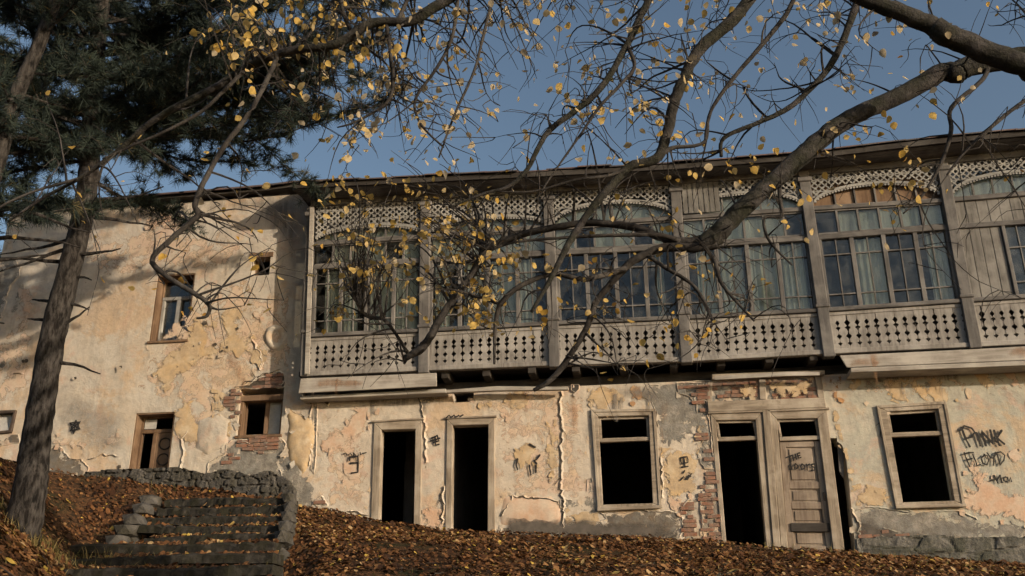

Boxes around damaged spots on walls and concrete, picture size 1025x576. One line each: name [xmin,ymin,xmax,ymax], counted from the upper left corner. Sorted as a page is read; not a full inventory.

peeling [0,260,32,401]
peeling [138,281,380,510]
crack [500,391,567,528]
flaking render [468,378,818,540]
flaking render [830,373,1025,540]